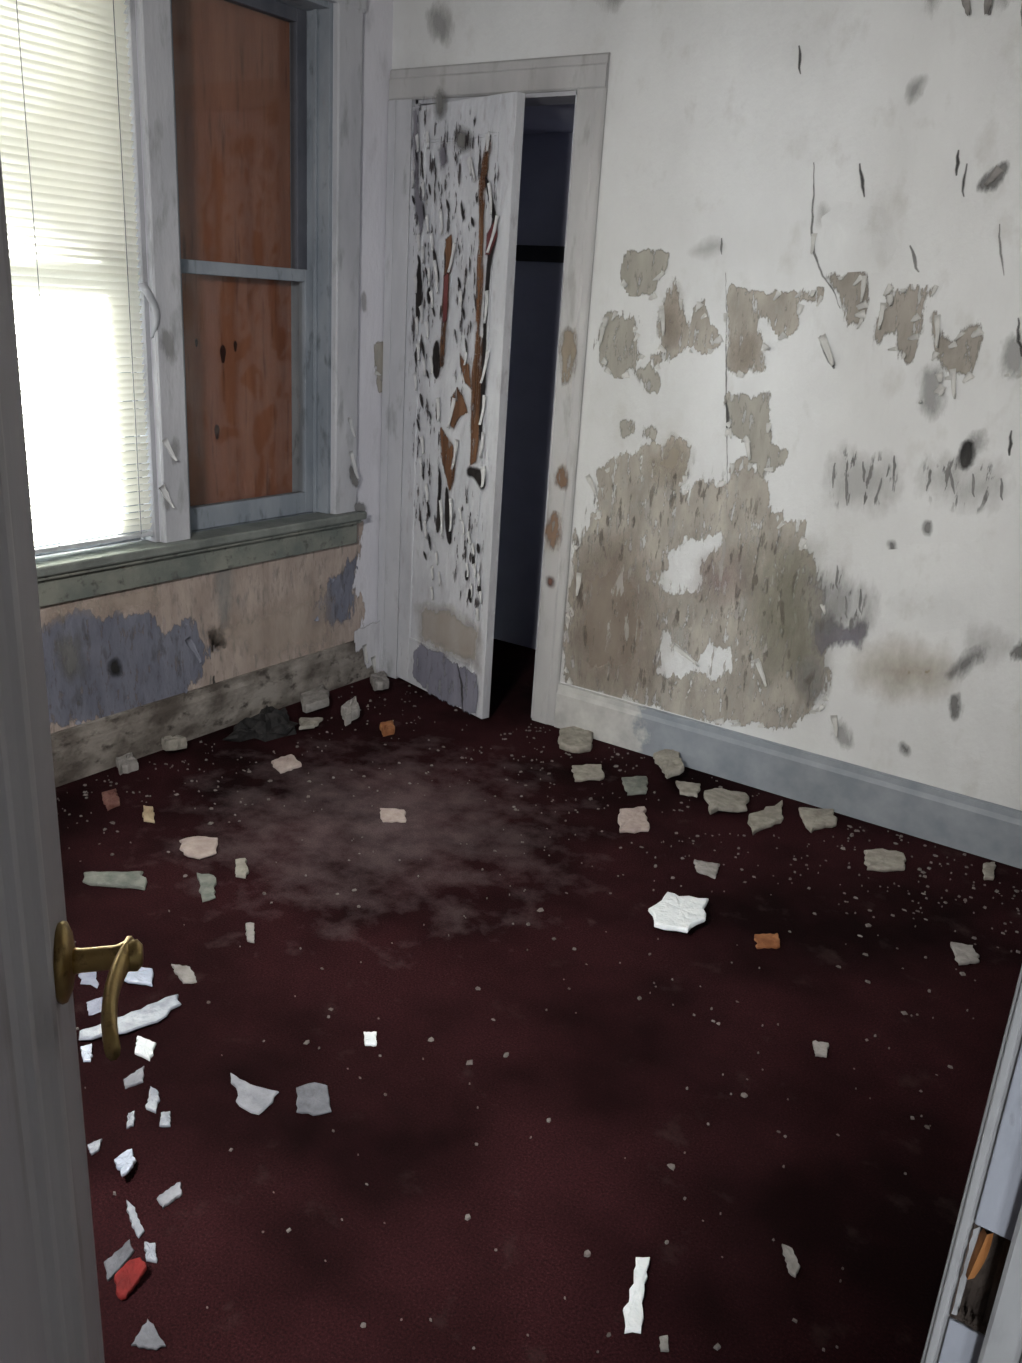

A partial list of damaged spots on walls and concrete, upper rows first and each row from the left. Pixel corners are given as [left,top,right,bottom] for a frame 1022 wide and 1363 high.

peeling [961,0,992,16]
peeling [593,248,984,404]
peeling [411,106,500,621]
peeling [348,417,359,487]
peeling [832,454,896,503]
spalling [926,440,1003,503]
peeling [40,503,368,693]
peeling [563,392,838,737]
peeling [50,715,99,733]
flaking render [341,696,360,726]
peeling [950,695,960,719]
spalling [949,1223,1011,1335]